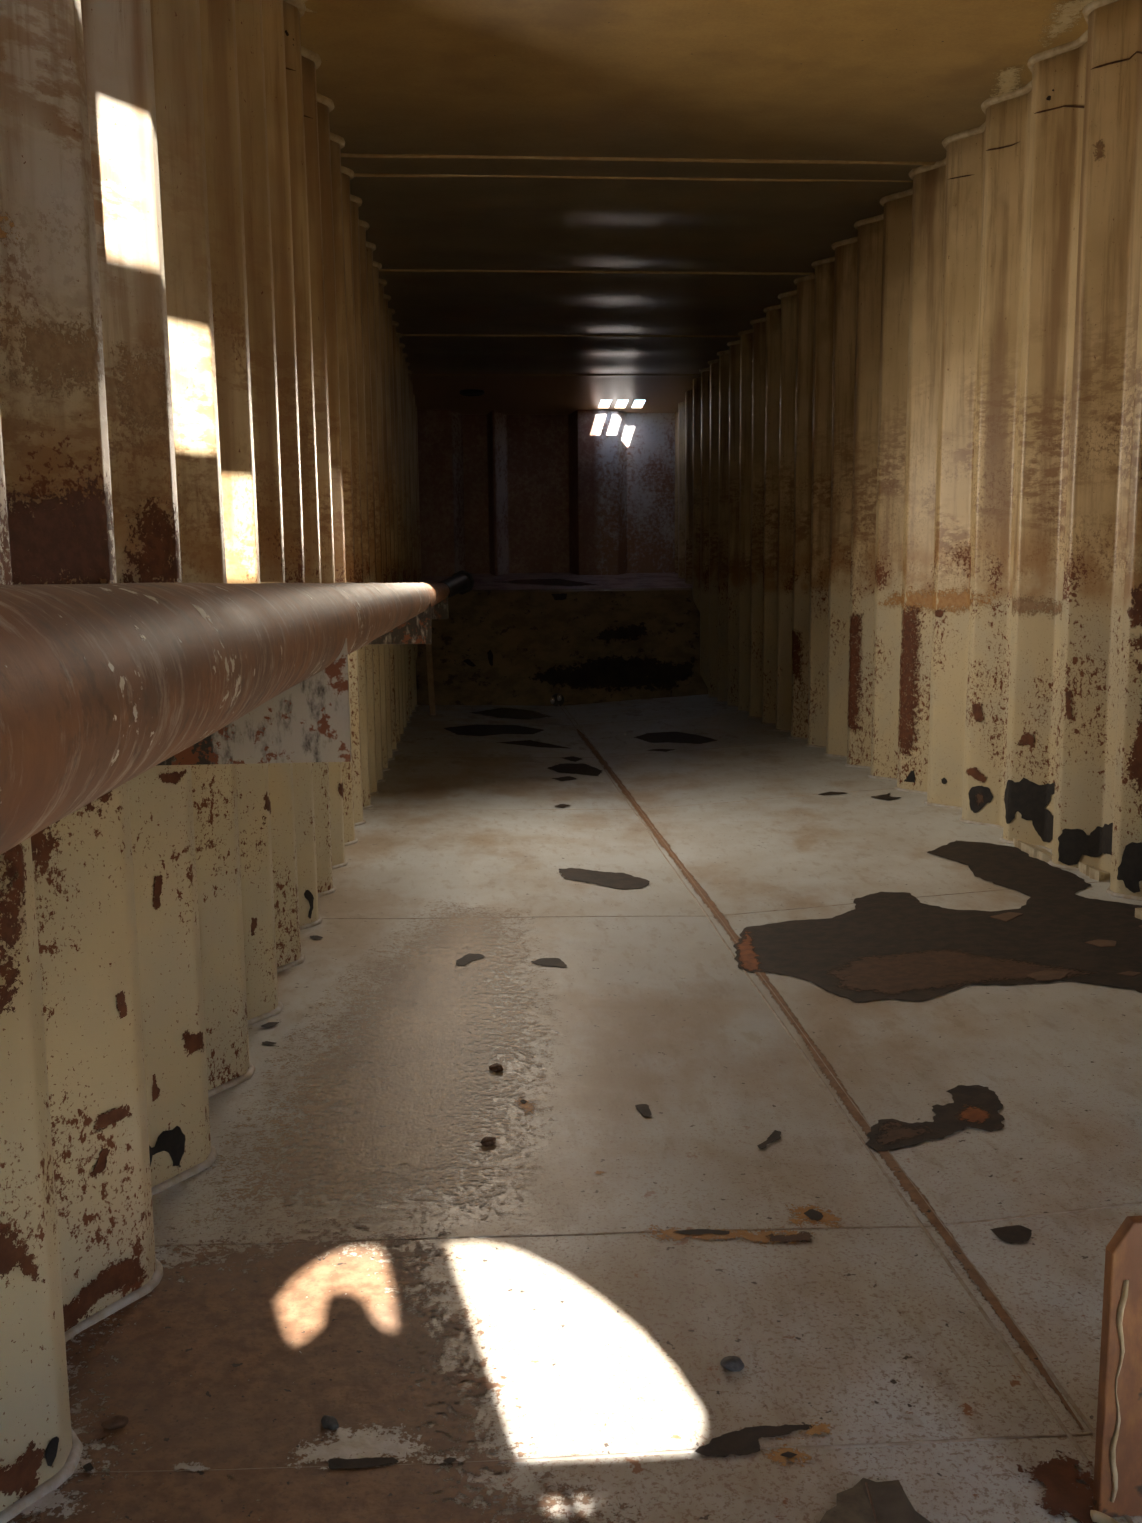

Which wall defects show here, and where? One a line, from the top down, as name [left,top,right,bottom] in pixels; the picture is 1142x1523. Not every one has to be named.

peeling [847,610,864,735]
peeling [871,605,946,800]
peeling [972,702,984,722]
peeling [1017,732,1035,748]
peeling [1065,690,1073,720]
peeling [1124,583,1142,799]
spalling [733,767,1142,1003]
spalling [149,1126,186,1167]
corrosion [7,900,643,1523]
corrosion [1016,1450,1118,1523]